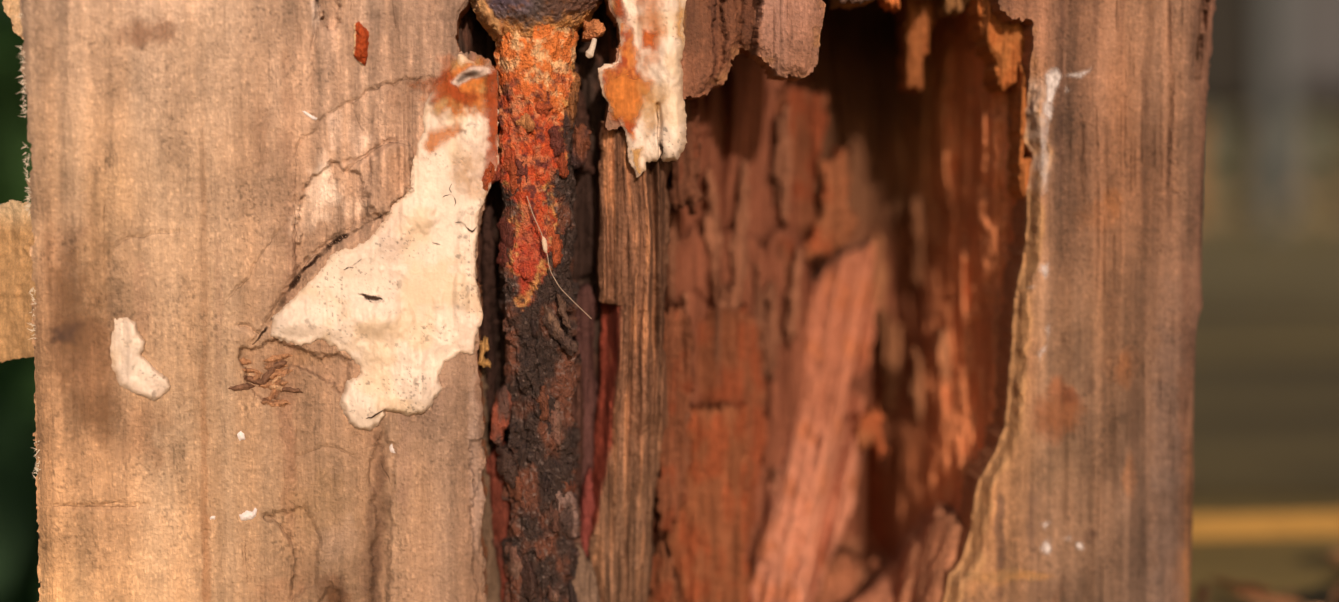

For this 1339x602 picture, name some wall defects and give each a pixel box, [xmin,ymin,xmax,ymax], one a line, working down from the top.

peeling [457,54,495,69]
peeling [598,0,687,178]
peeling [228,83,500,431]
corrosion [496,216,514,268]
corrosion [547,227,563,269]
corrosion [529,293,578,356]
peeling [110,317,171,401]
corrosion [490,383,513,447]
corrosion [536,384,562,450]
corrosion [554,479,579,539]